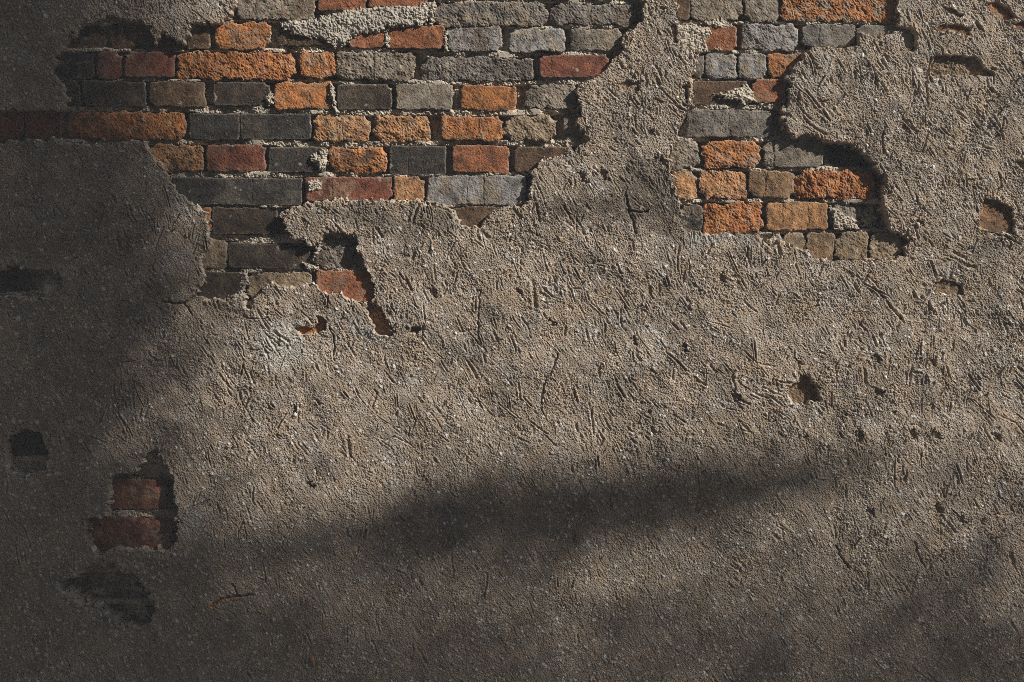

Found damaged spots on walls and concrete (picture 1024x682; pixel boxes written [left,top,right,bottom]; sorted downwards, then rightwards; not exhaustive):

spalling [0,0,645,338]
spalling [667,0,920,264]
spalling [978,198,1020,238]
spalling [787,357,822,406]
spalling [57,449,180,631]